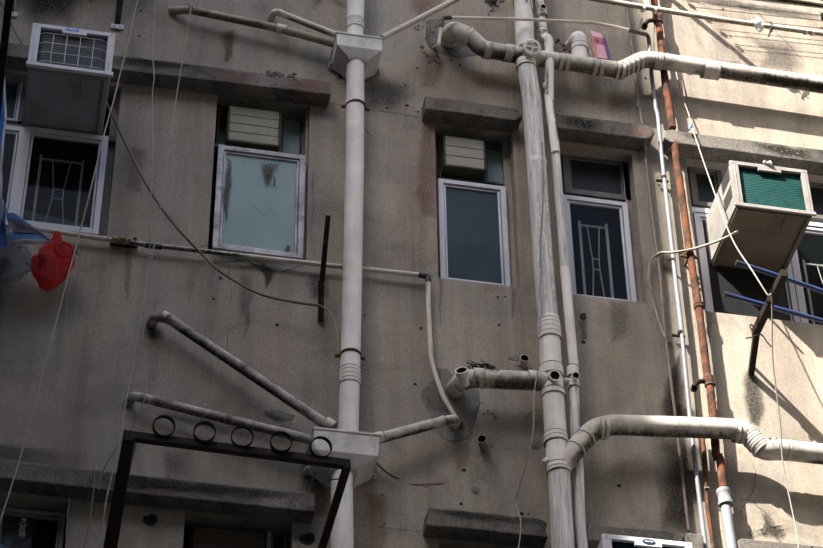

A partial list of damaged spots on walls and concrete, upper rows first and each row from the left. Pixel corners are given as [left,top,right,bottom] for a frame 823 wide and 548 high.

water stain [745,374,762,424]